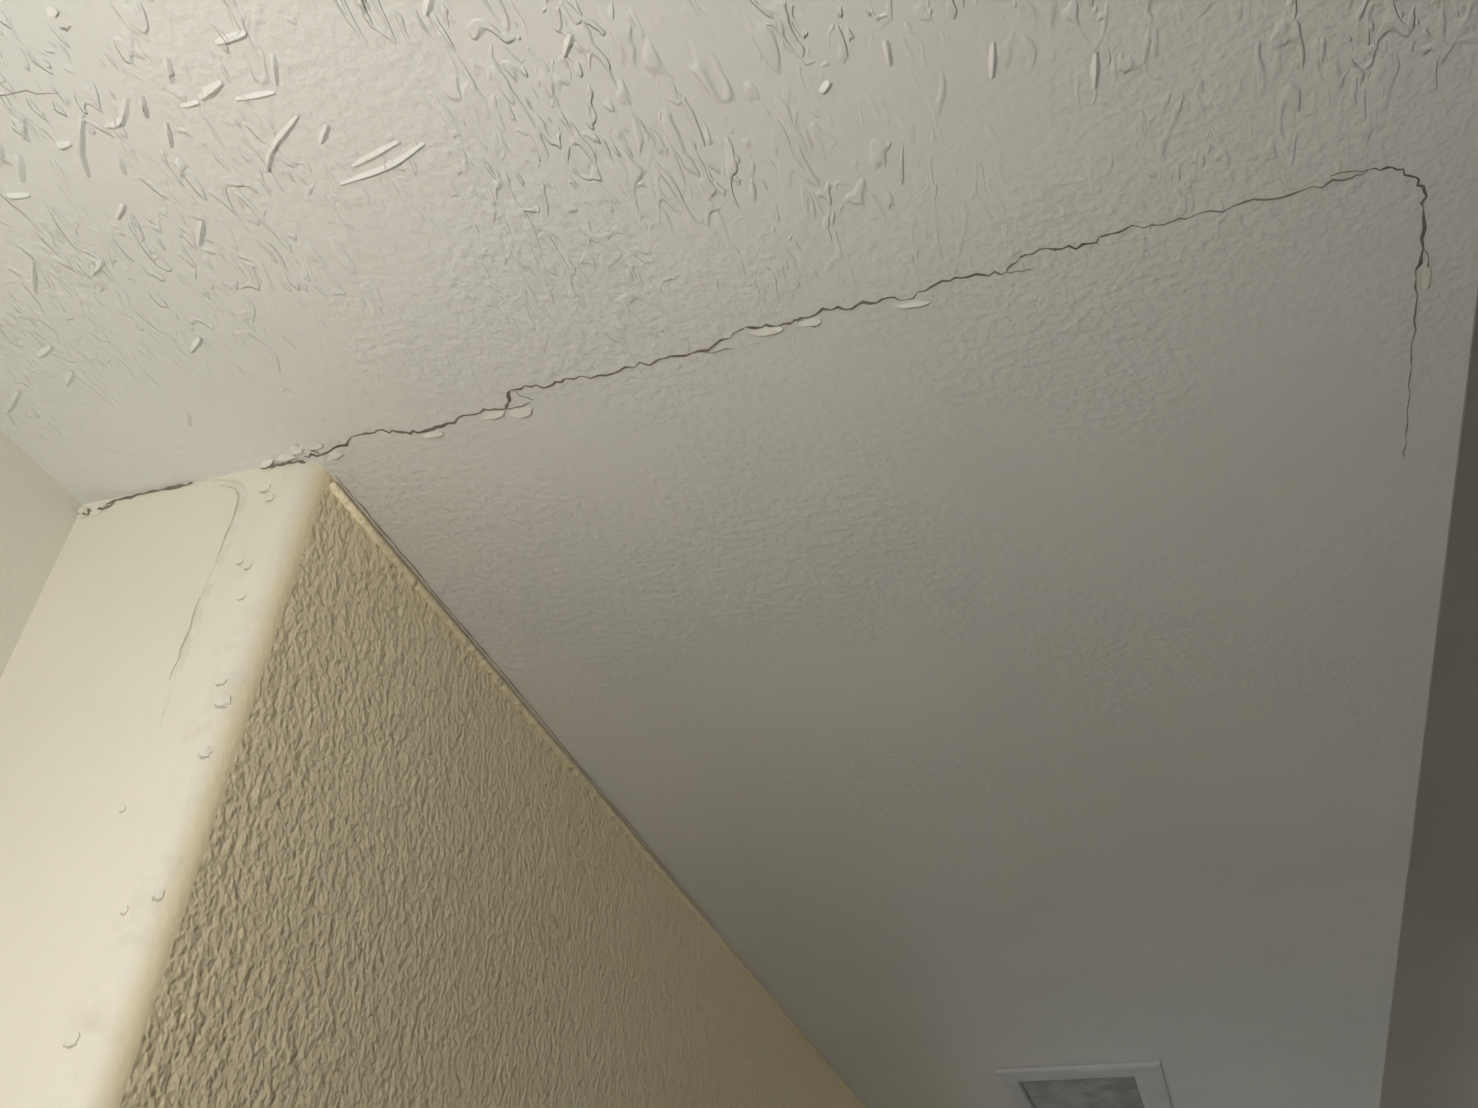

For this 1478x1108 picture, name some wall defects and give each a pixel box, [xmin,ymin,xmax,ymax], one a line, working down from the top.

crack [77,482,193,519]
crack [260,166,1431,925]